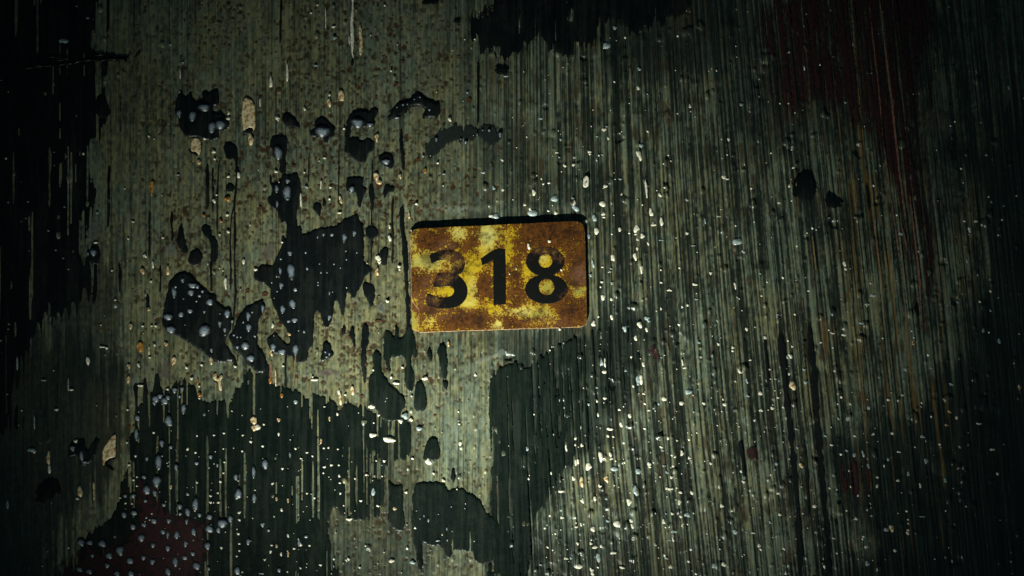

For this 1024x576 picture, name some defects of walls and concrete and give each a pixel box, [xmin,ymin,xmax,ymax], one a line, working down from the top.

peeling [453,0,690,75]
peeling [175,68,261,203]
peeling [68,90,648,576]